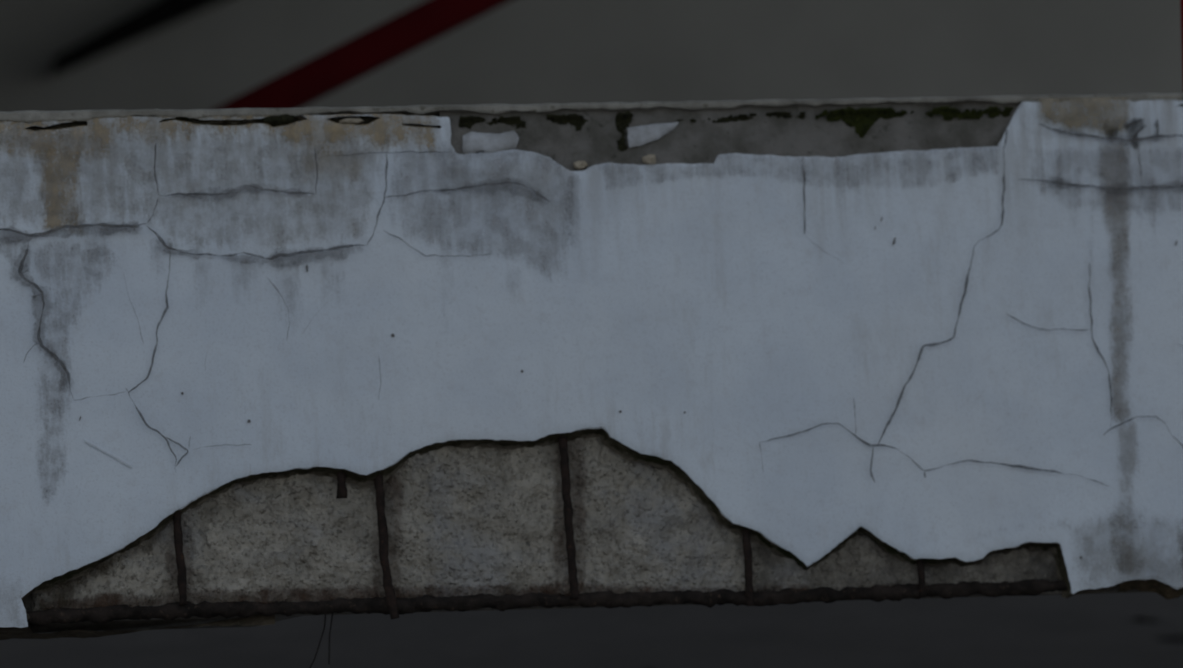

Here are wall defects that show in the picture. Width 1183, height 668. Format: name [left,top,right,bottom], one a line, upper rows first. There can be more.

damp [0,116,200,232]
damp [214,114,434,152]
peeling [402,102,1021,171]
damp [1039,97,1129,135]
damp [1101,146,1128,306]
crack [0,144,550,466]
crack [759,119,1183,486]
flaking render [24,427,1071,626]
rust [41,593,175,611]
rust [201,585,464,604]